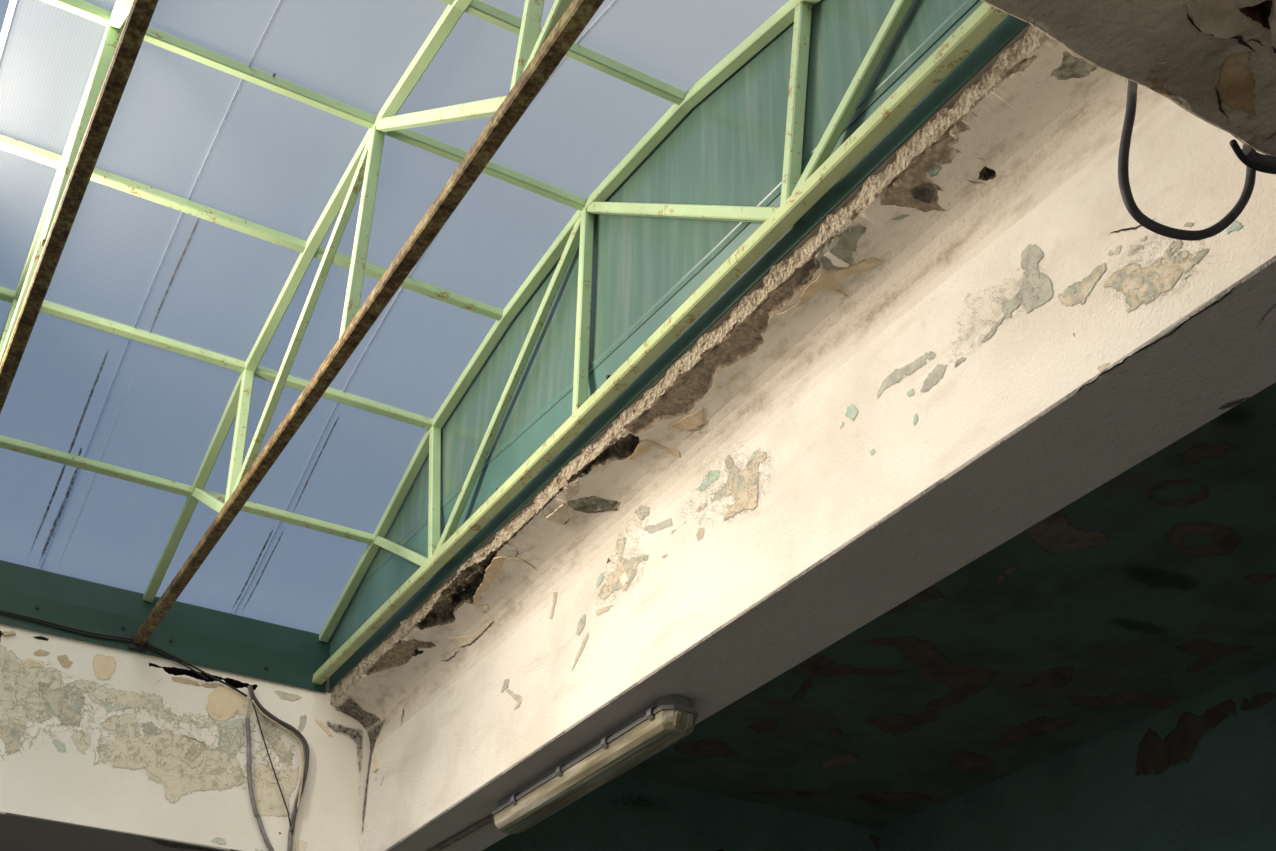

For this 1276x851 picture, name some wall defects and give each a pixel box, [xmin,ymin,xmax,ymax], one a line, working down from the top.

spalling [1051,51,1097,80]
spalling [1145,61,1172,98]
peeling [1186,1,1253,39]
peeling [1268,0,1276,49]
peeling [877,222,1209,397]
spalling [546,226,879,525]
spalling [364,551,506,676]
peeling [571,450,771,671]
peeling [884,587,945,614]
peeling [0,631,301,817]
peeling [501,679,521,709]
peeling [1135,692,1276,776]